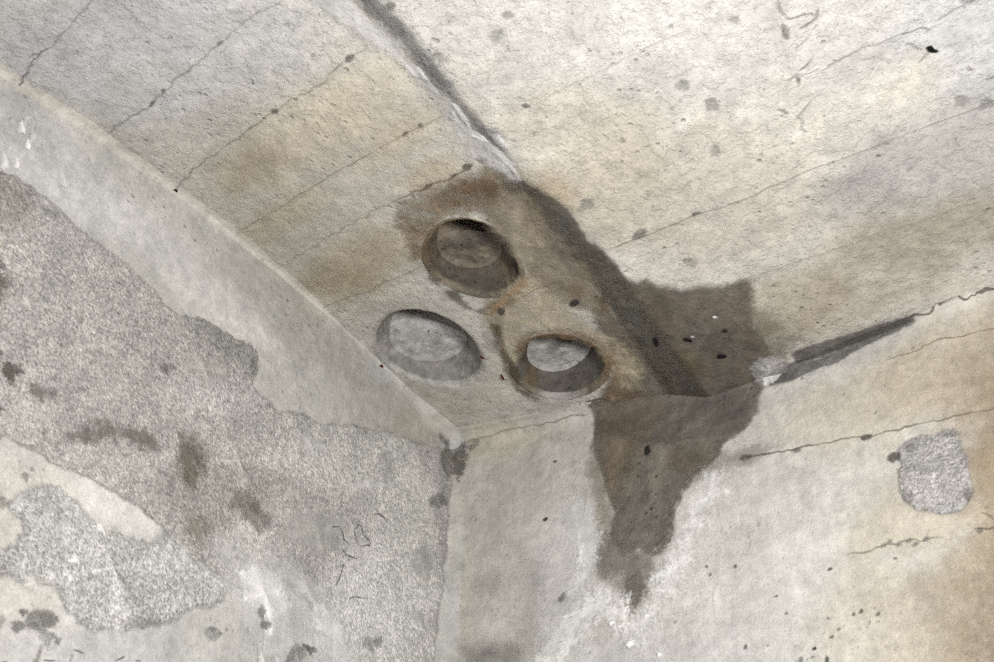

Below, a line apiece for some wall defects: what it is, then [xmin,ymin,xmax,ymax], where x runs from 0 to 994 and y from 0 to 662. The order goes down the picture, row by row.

crack [910,287,994,317]
leakage [0,354,24,383]
leakage [317,0,796,662]
crack [890,328,994,359]
peeling [0,172,452,662]
crack [740,407,994,461]
spalling [888,428,974,514]
crack [849,536,939,554]